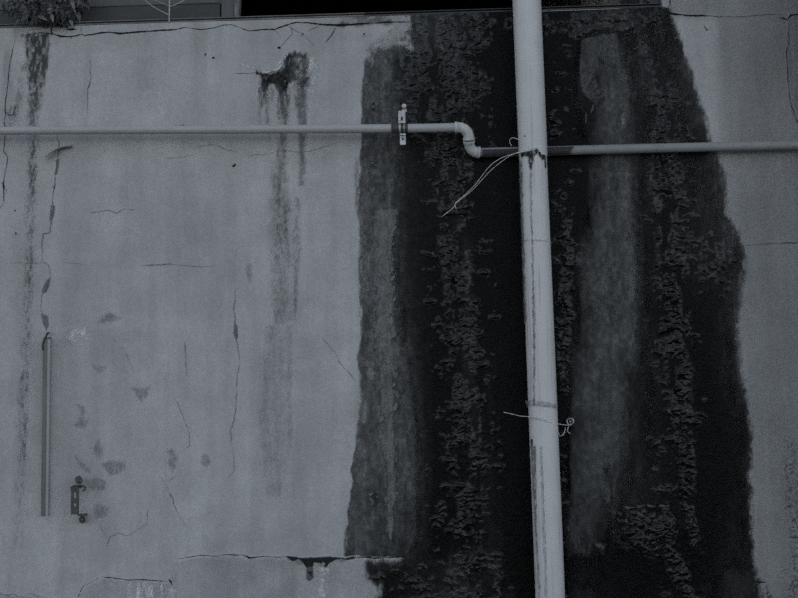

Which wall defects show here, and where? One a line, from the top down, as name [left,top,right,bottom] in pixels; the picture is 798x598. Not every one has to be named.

water stain [22,33,49,123]
crack [1,21,412,202]
water stain [281,58,318,165]
crack [666,0,798,122]
crack [40,184,78,331]
peeling [368,209,400,540]
water stain [344,12,535,598]
water stain [542,7,771,598]
crack [78,577,172,596]
crack [180,552,278,560]